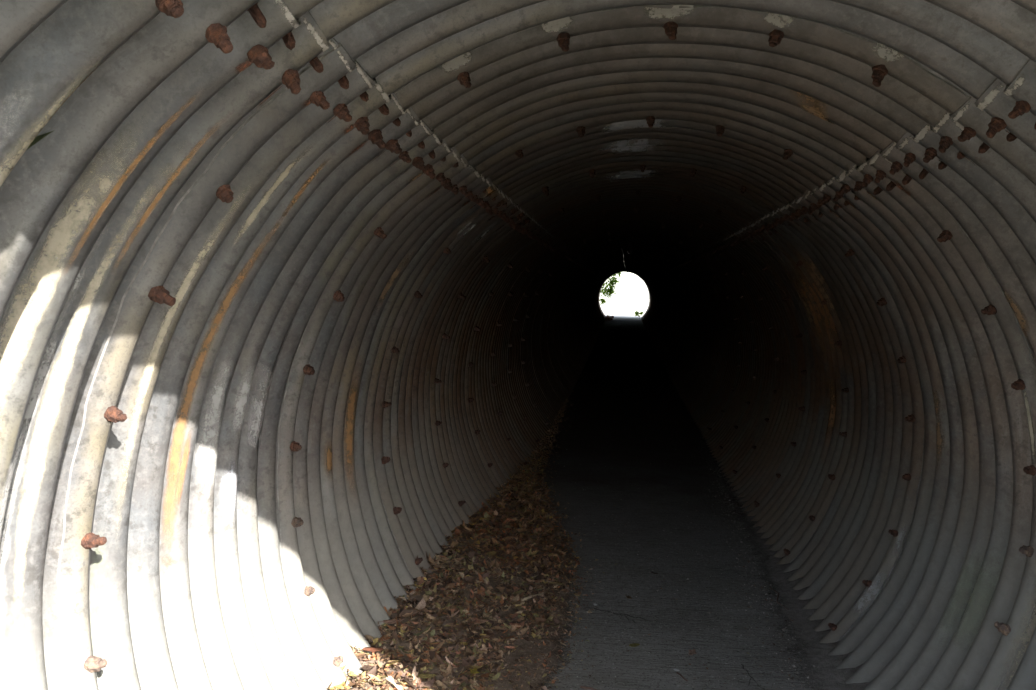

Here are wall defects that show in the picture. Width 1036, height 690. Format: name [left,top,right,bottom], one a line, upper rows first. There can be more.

rust [275,0,561,250]
rust [764,13,793,35]
rust [713,77,1024,256]
rust [165,245,264,524]